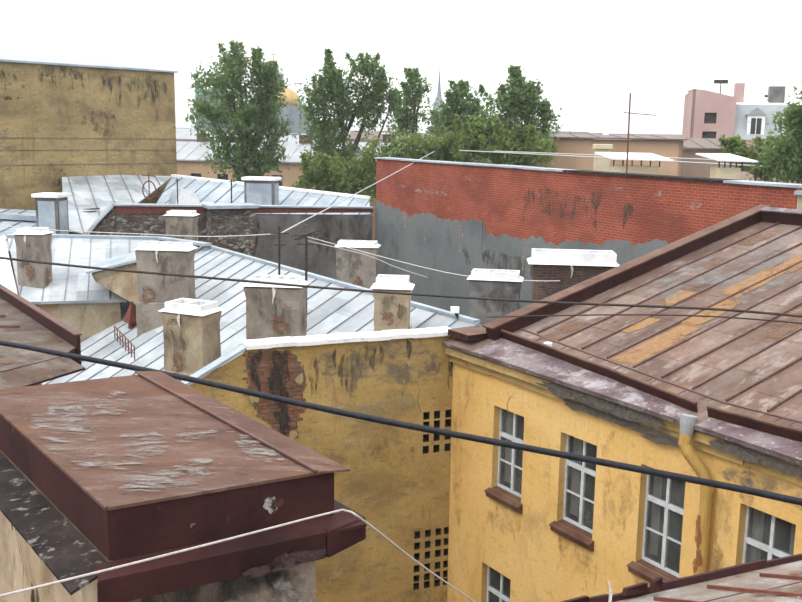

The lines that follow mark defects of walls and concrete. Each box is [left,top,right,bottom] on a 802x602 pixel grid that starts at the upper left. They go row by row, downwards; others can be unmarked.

flaking render [375,200,673,316]
water stain [311,339,453,393]
peeling [32,399,121,450]
peeling [73,433,162,469]
peeling [126,458,213,491]
peeling [237,435,284,462]
flaking render [243,349,307,440]
flaking render [548,382,680,448]
rust [693,515,702,573]